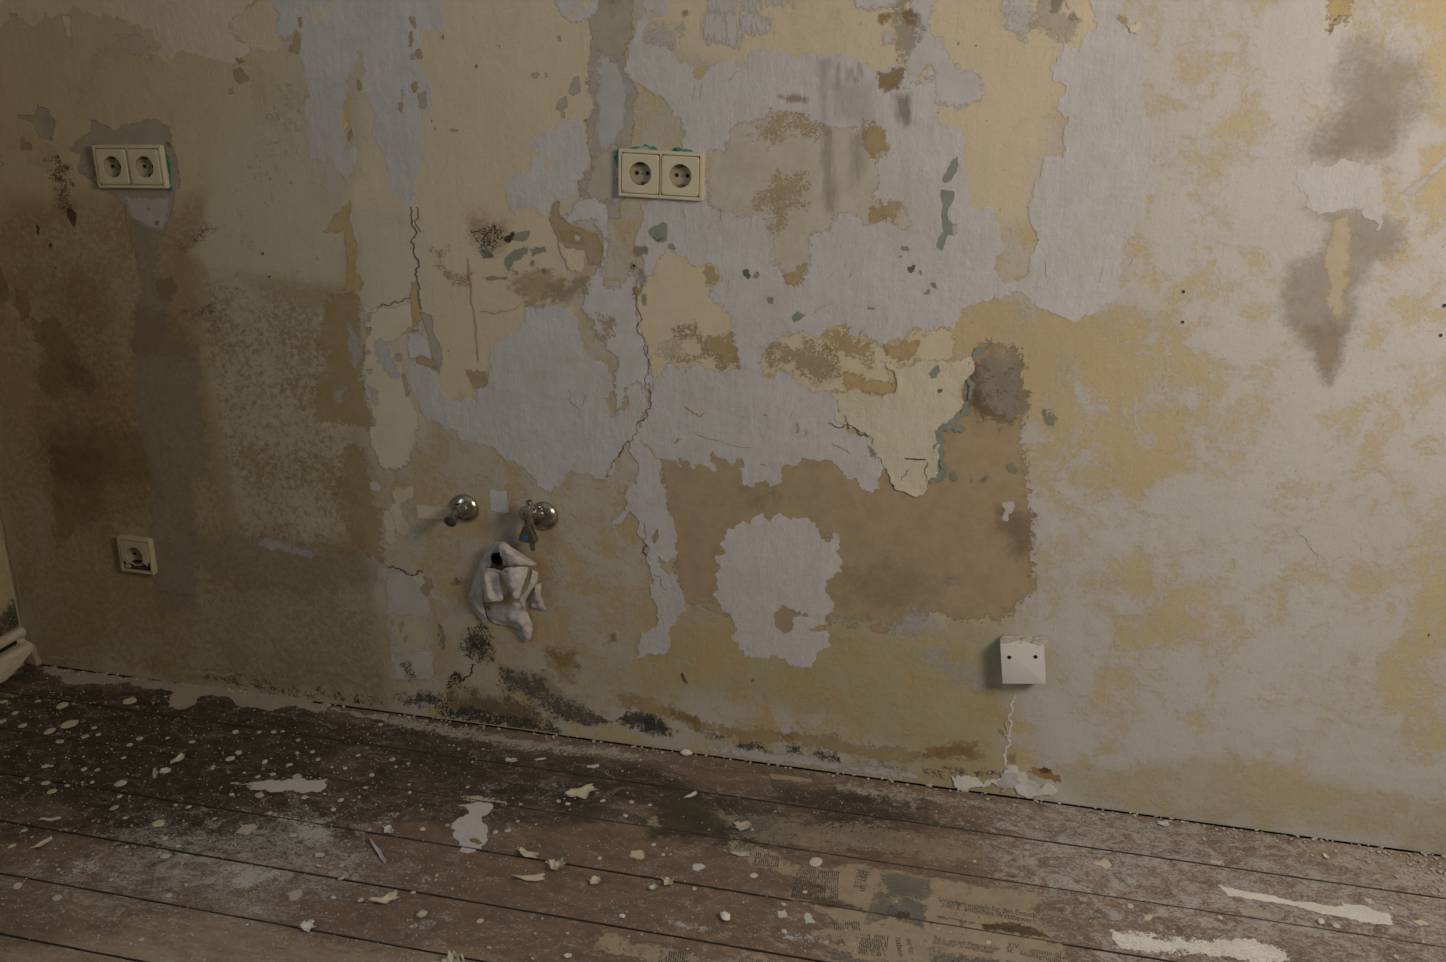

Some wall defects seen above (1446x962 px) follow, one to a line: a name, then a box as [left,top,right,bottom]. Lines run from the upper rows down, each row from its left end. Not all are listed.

flaking render [1325,0,1354,35]
flaking render [556,0,638,219]
flaking render [480,201,603,273]
flaking render [633,109,937,379]
spalling [936,157,958,250]
leakage [1291,215,1395,363]
flaking render [361,282,443,544]
flaking render [651,304,1057,629]
flaking render [385,571,445,682]
leakage [205,620,678,737]
leakage [696,729,841,763]
crack [1003,692,1016,771]